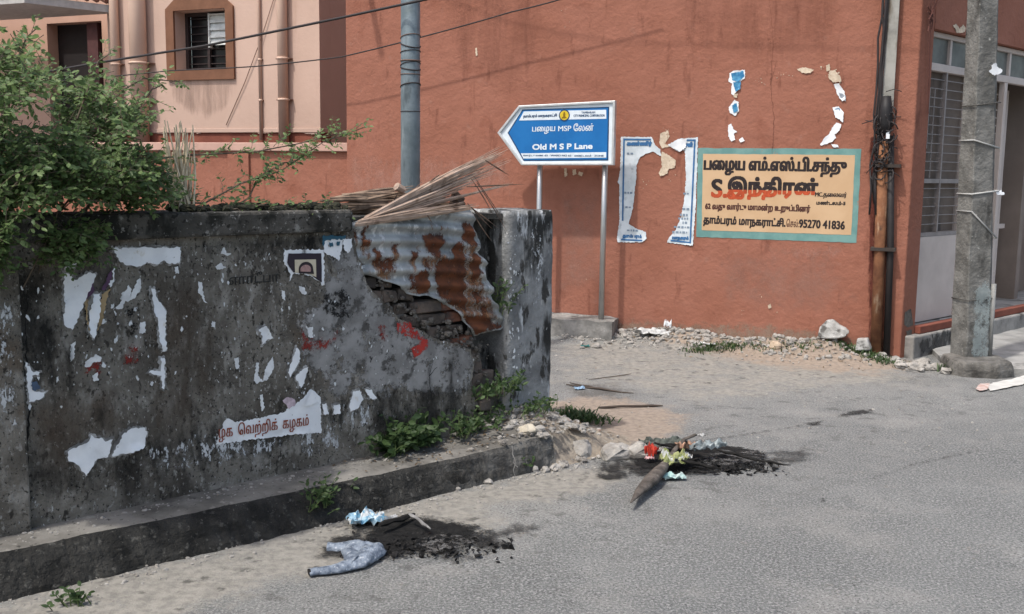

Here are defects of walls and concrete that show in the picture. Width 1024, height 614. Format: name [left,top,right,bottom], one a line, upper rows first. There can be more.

leakage [19,274,53,371]
leakage [166,295,192,348]
peeling [285,237,503,457]
rust [353,221,502,335]
leakage [377,365,467,431]